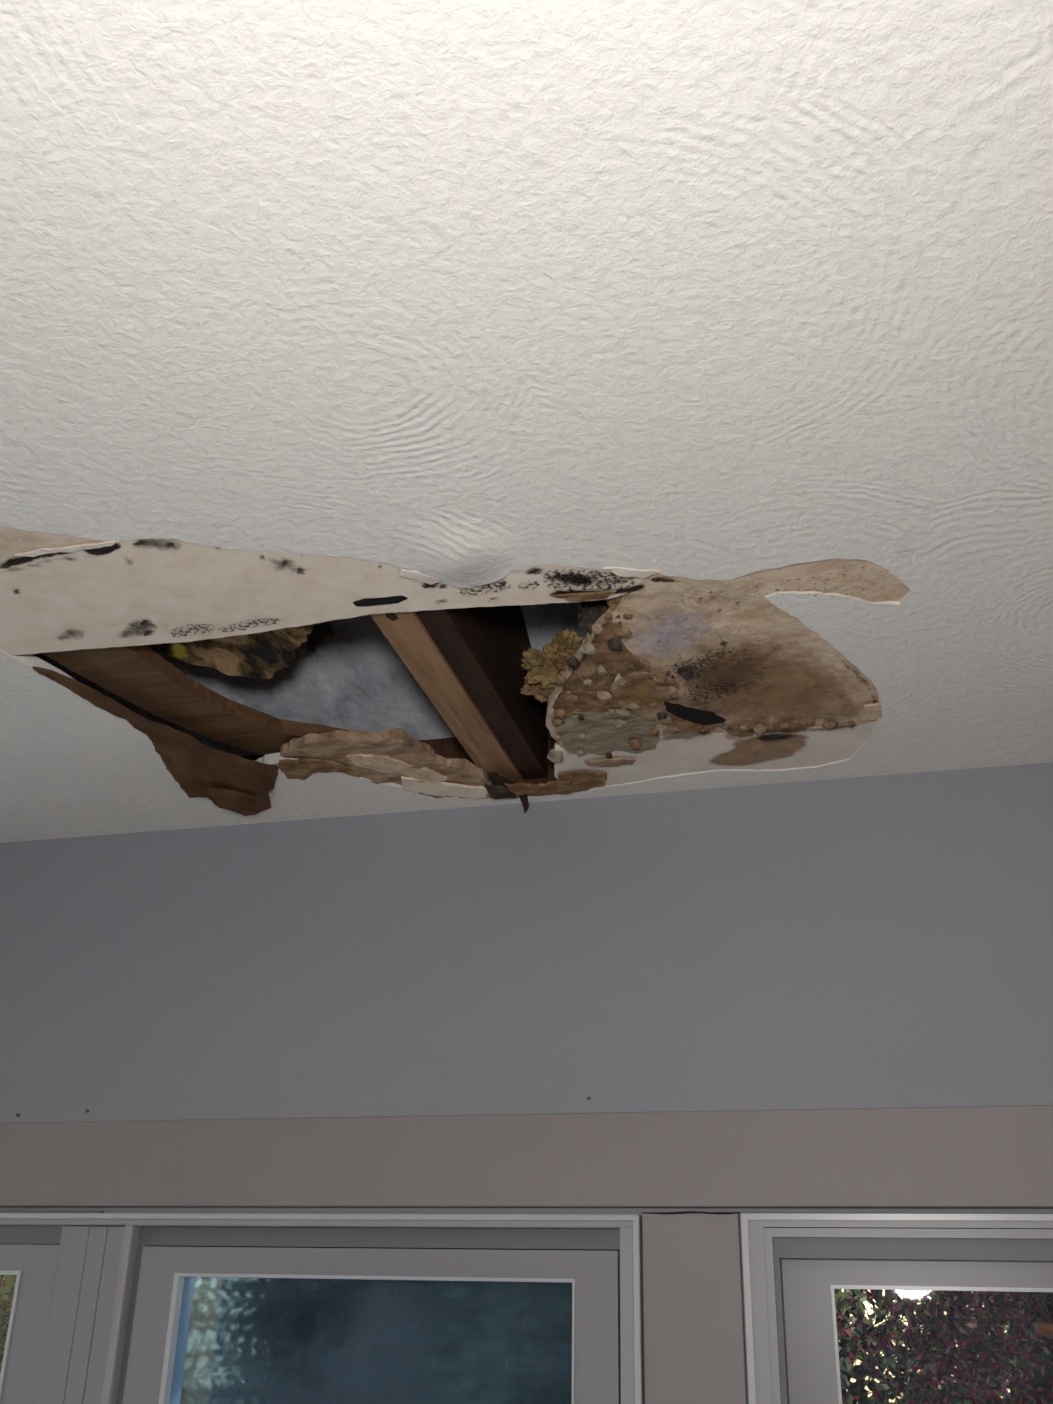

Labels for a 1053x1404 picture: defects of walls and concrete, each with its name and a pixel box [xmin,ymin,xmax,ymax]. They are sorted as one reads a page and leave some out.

peeling [0,527,910,799]